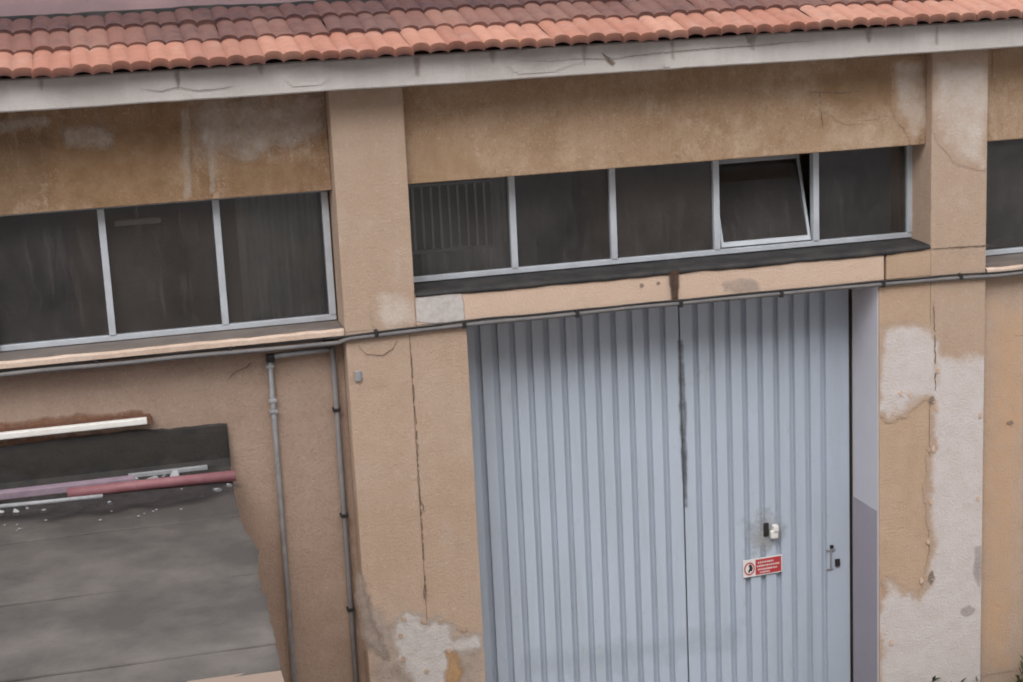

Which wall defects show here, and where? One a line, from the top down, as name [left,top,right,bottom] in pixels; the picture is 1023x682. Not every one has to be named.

crack [142,74,233,92]
crack [359,340,427,600]
peeling [880,319,984,682]
flaking render [391,610,483,682]